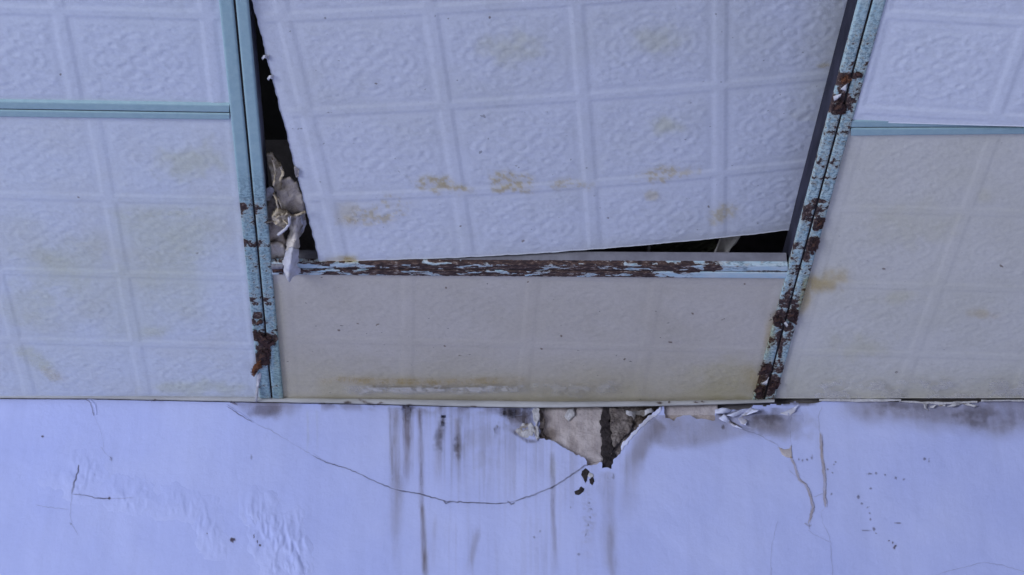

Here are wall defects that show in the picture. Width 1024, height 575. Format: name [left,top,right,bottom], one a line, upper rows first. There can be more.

rust [839,71,863,85]
rust [832,101,846,115]
rust [808,218,826,255]
rust [771,310,799,328]
rust [251,319,275,377]
rust [753,363,781,399]
spalling [515,405,759,495]
crack [779,446,792,458]